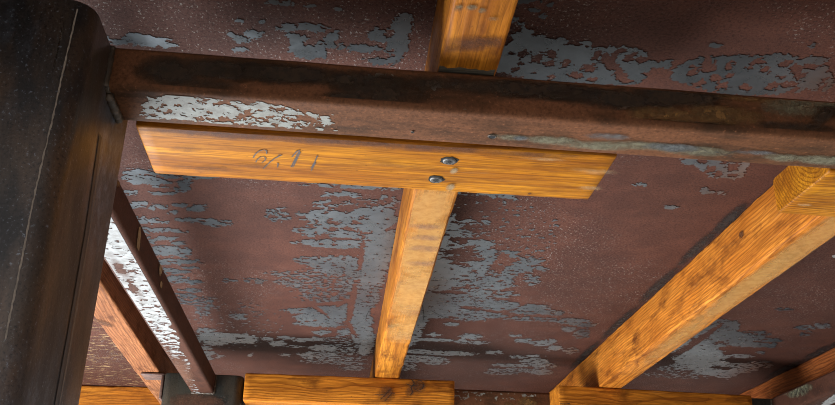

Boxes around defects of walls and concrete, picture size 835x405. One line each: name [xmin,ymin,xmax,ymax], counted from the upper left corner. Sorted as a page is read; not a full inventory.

peeling [139,95,338,131]
peeling [226,19,266,53]
peeling [275,13,414,76]
rust [136,56,718,110]
peeling [496,16,835,96]
rust [763,105,835,131]
peeling [104,218,190,369]
peeling [121,168,401,371]
peeling [403,192,599,376]
peeling [643,319,784,380]